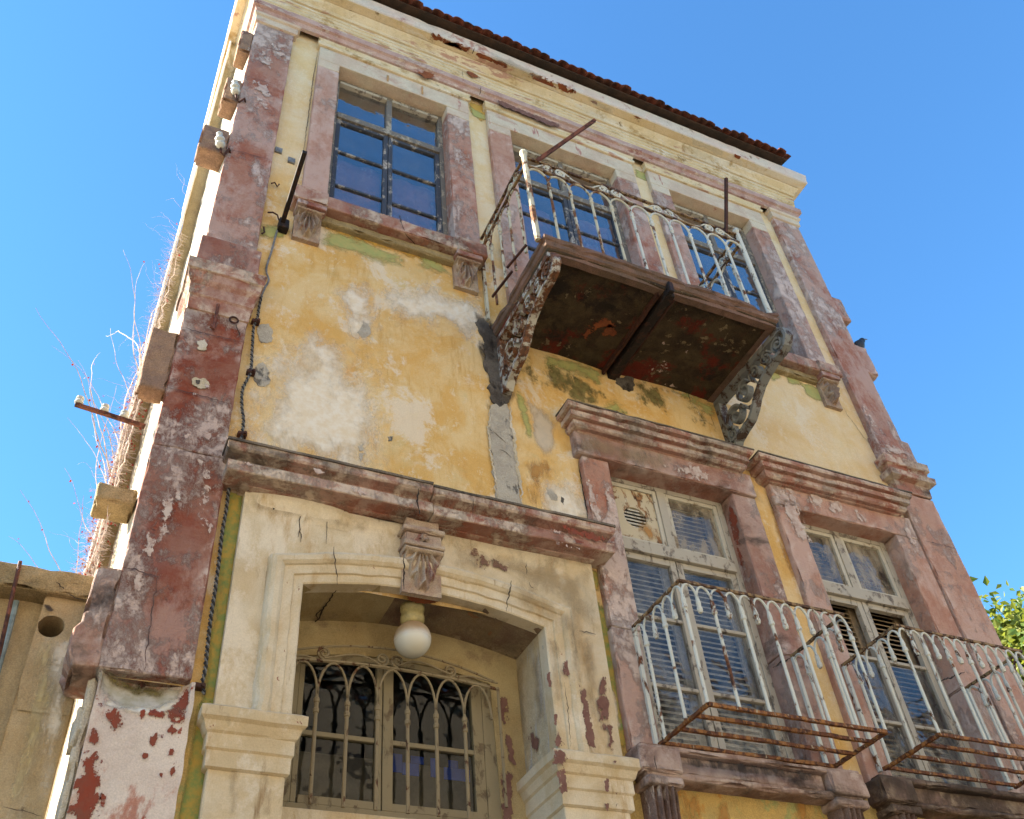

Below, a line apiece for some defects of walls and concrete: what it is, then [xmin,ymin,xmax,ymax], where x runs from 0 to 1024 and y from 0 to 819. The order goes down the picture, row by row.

peeling [431,33,507,68]
peeling [529,72,577,93]
water stain [546,357,627,414]
flaking render [616,376,635,392]
mould [637,382,665,408]
peeling [142,491,181,558]
crack [298,516,338,622]
crack [124,567,158,670]
spalling [54,672,190,819]
peeling [497,697,516,819]
peeling [552,714,568,794]
peeling [579,677,616,763]